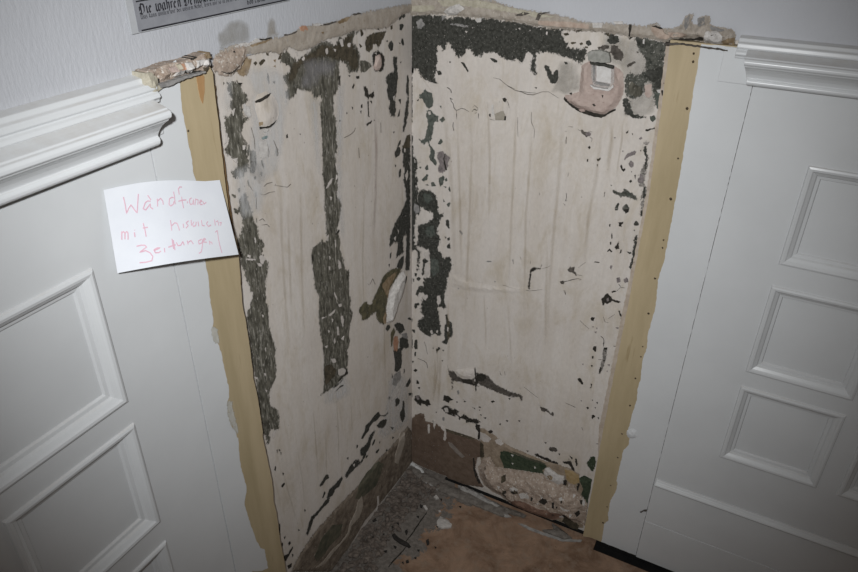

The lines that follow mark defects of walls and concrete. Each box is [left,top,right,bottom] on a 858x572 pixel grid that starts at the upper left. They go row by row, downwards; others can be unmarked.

peeling [132,0,736,572]